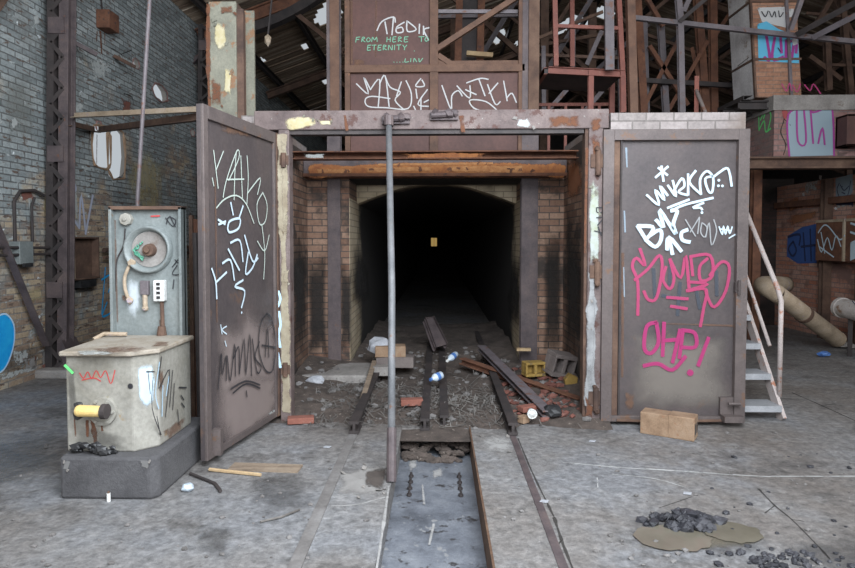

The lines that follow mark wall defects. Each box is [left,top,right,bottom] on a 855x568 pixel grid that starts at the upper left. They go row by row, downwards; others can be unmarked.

peeling [212,17,228,48]
peeling [224,68,233,92]
rust [308,153,566,178]
peeling [589,184,601,259]
peeling [220,115,332,438]
damp [342,274,351,342]
peeling [584,273,598,406]